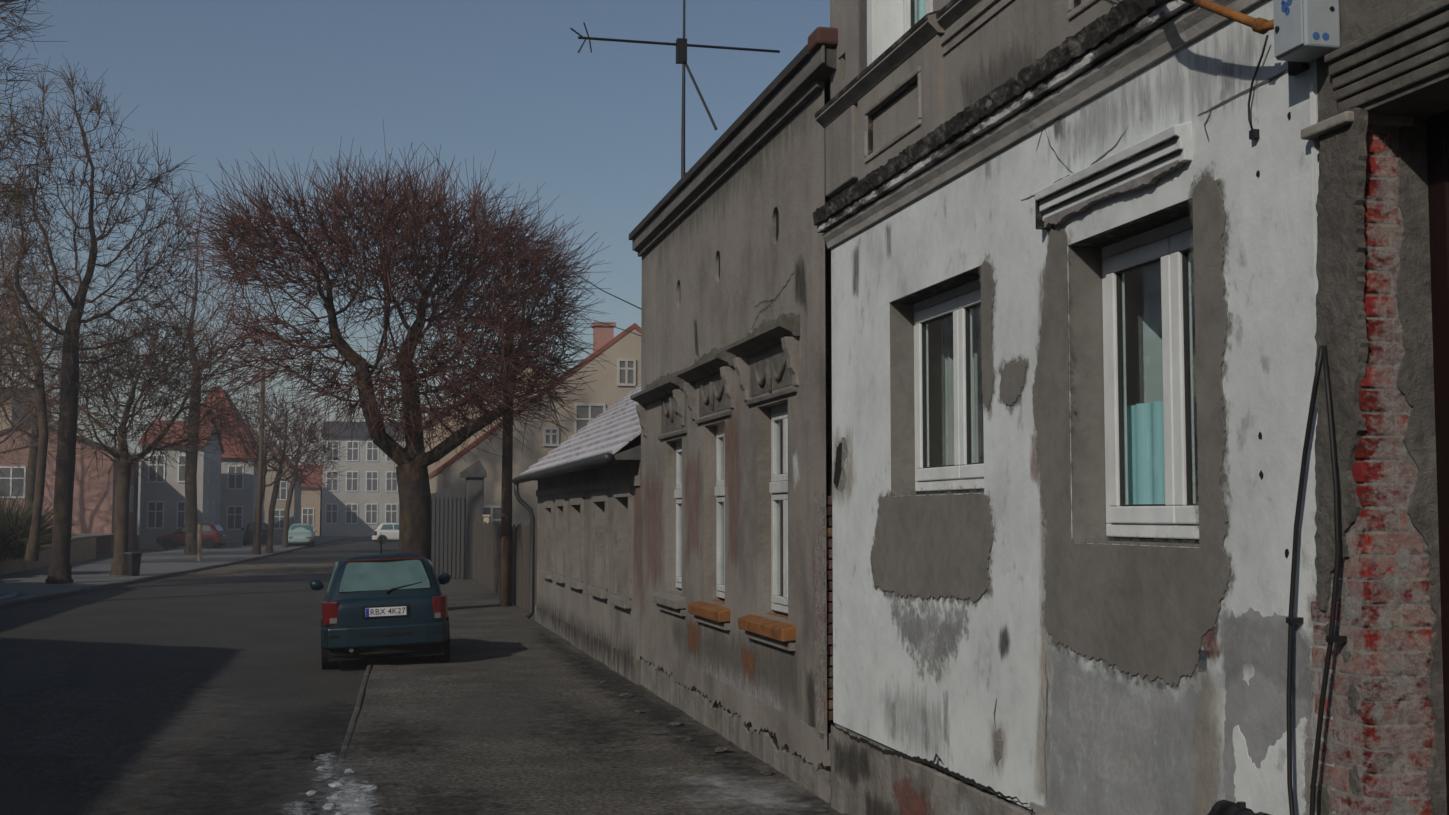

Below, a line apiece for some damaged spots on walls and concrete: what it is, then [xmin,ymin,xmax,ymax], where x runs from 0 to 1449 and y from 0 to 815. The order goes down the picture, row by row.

water stain [538,599,821,815]
water stain [835,743,869,782]
crack [830,651,1048,815]
peeling [1204,607,1315,815]